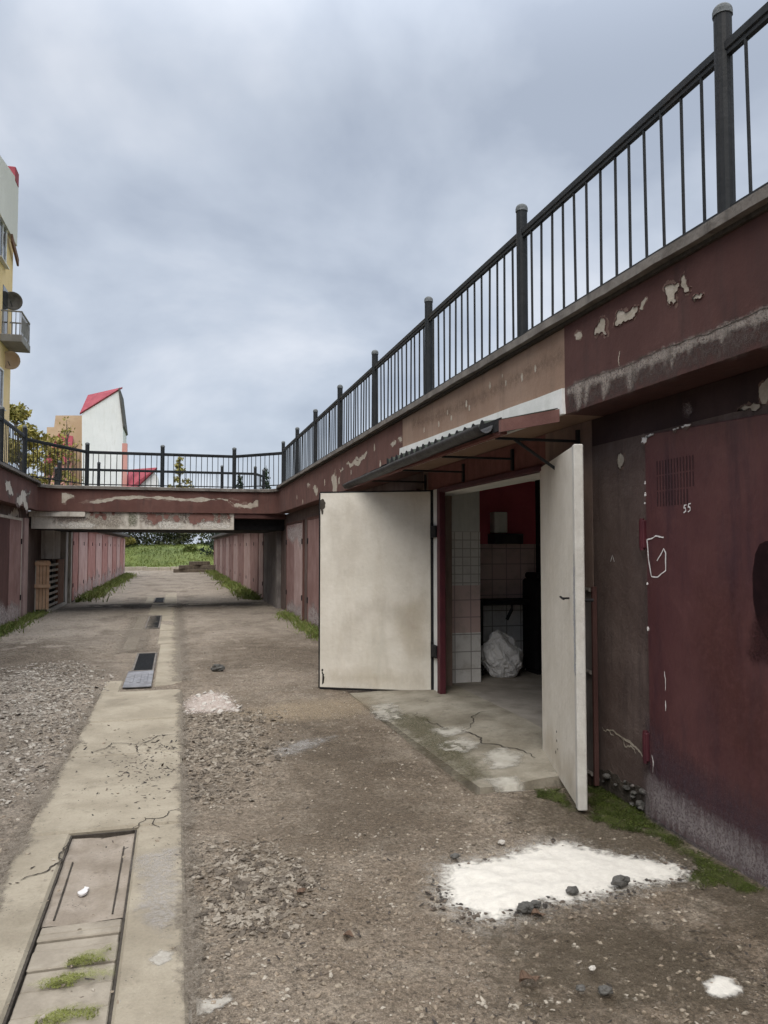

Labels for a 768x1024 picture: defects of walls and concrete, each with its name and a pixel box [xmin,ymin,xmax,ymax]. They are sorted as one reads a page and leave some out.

peeling [662,271,705,309]
peeling [574,296,648,341]
water stain [567,307,768,409]
peeling [5,478,31,518]
peeling [61,493,258,529]
peeling [307,444,381,514]
crack [414,710,536,758]
crack [132,807,181,830]
crack [21,839,70,880]